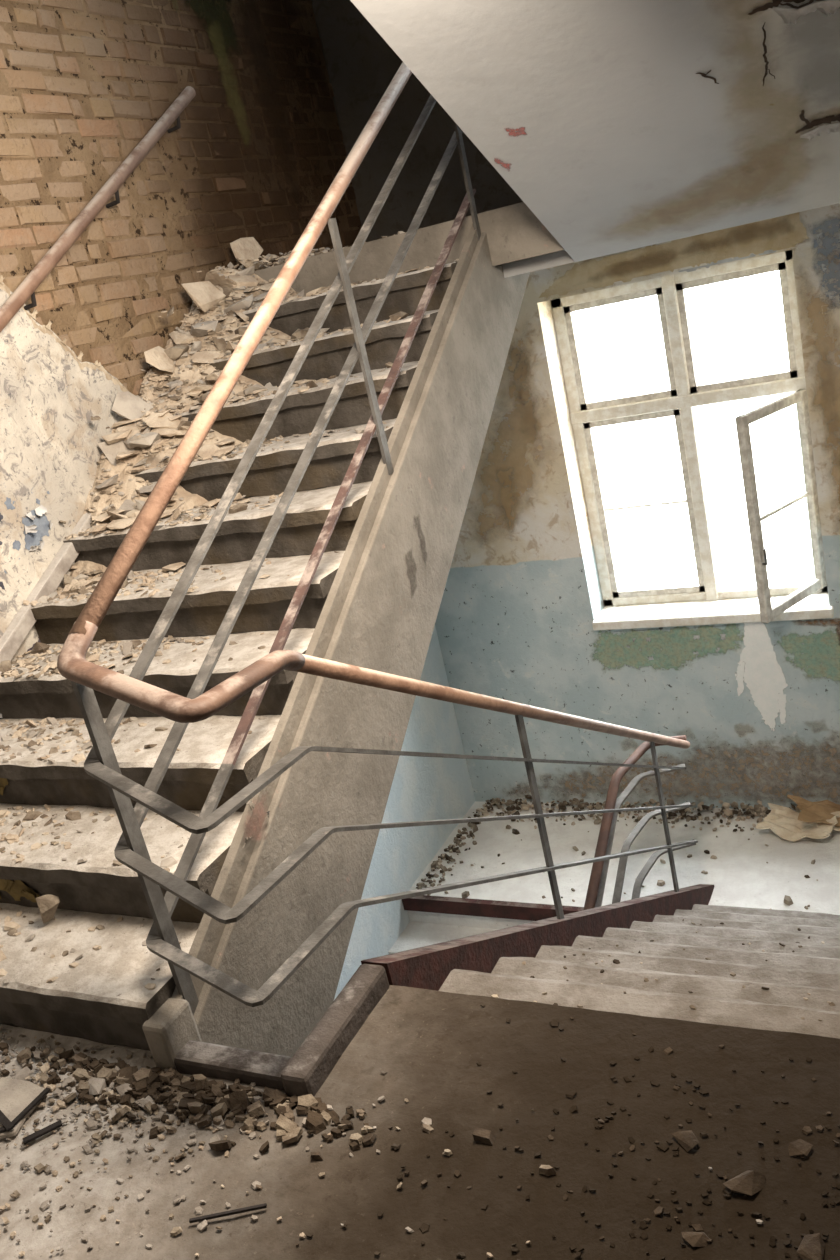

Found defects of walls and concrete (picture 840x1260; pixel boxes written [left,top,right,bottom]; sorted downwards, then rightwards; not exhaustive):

crack [748,0,840,86]
crack [795,110,840,141]
leakage [479,342,542,535]
peeling [0,491,53,551]
peeling [593,623,744,670]
peeling [777,629,840,681]
peeling [0,879,40,903]